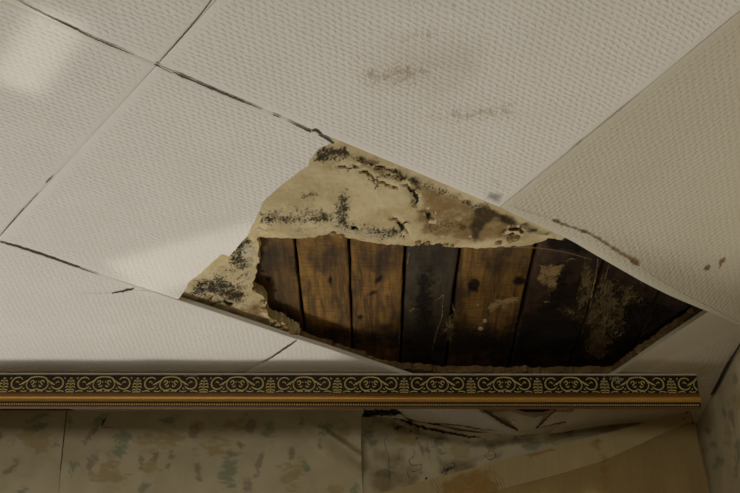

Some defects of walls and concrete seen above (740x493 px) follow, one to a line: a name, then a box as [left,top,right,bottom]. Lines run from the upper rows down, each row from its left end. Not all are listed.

damp [259,189,402,240]
crack [408,187,420,204]
damp [314,146,536,241]
spalling [181,138,703,388]
corrosion [552,220,654,276]
damp [318,234,671,362]
damp [362,409,482,456]